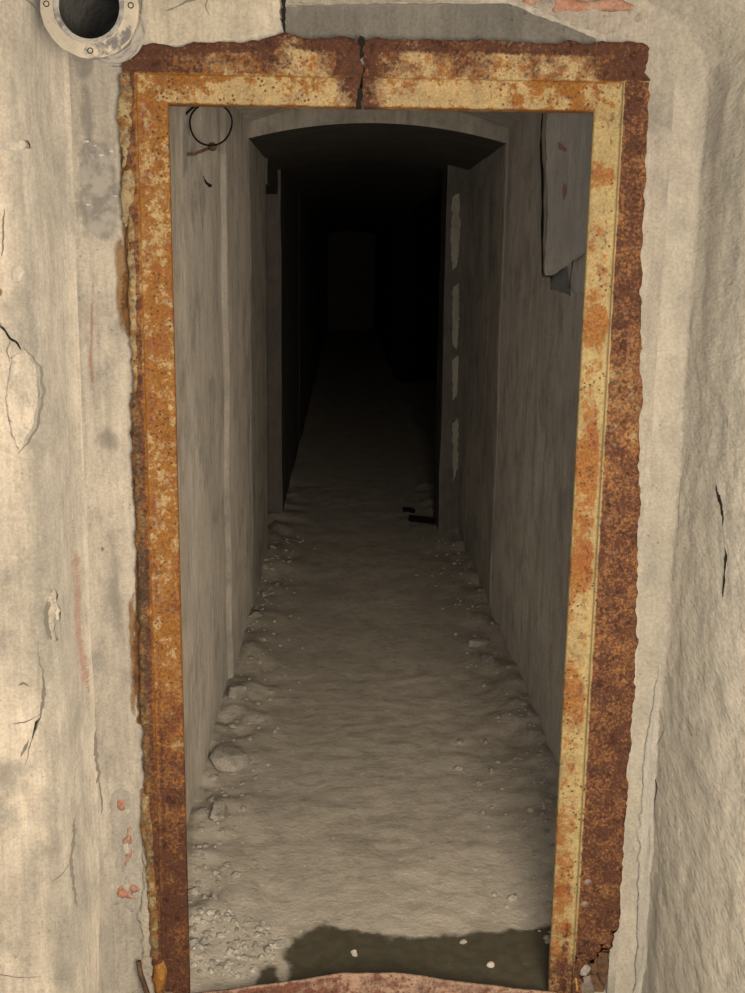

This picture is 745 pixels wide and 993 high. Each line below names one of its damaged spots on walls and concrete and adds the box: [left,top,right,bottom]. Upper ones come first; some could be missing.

crack [166,0,209,14]
flaking render [141,0,648,50]
rust [116,225,131,336]
crack [0,325,21,363]
crack [716,486,727,597]
rust [129,560,141,724]
crack [14,654,46,764]
rust [575,953,609,993]